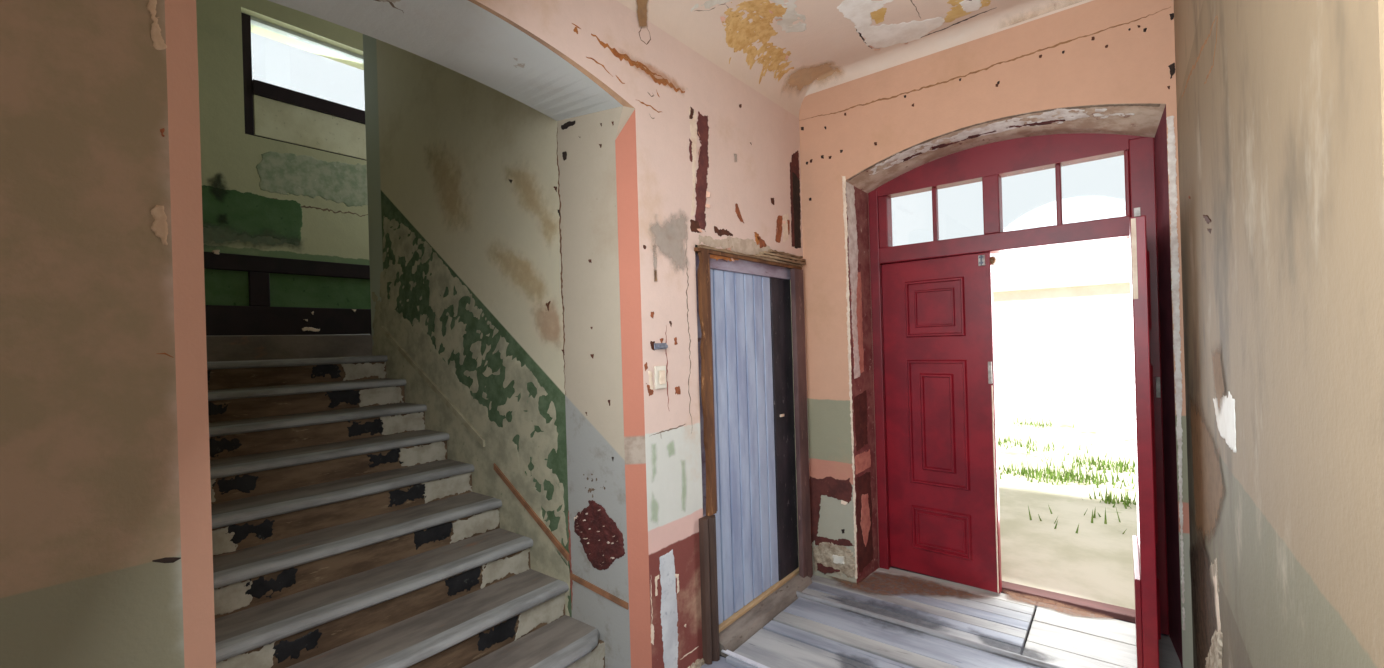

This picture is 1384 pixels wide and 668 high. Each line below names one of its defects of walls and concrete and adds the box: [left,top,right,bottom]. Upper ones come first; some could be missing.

peeling [837,0,945,50]
crack [910,0,997,38]
crack [799,7,1170,121]
peeling [202,151,368,254]
peeling [689,107,843,262]
peeling [209,436,242,457]
peeling [311,217,625,651]
peeling [1213,391,1236,453]
peeling [212,519,275,555]
peeling [214,567,298,615]
peeling [651,574,679,645]
peeling [216,629,322,668]